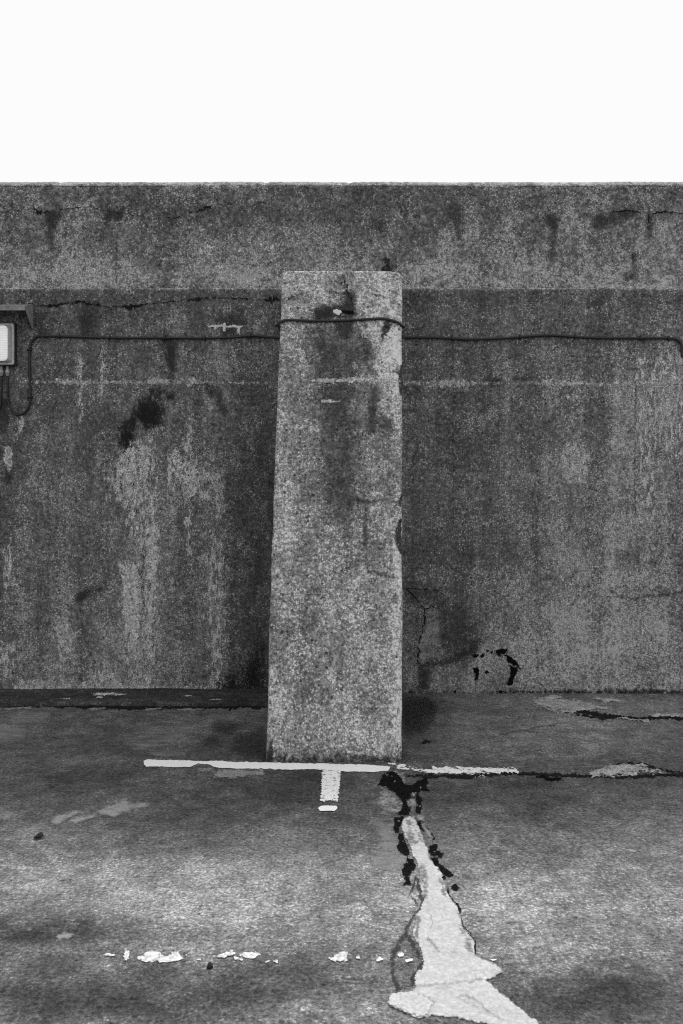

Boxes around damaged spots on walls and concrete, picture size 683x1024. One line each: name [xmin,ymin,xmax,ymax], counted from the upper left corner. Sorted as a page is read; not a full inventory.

crack [608,210,683,228]
crack [27,296,280,310]
damp [0,339,271,689]
crack [406,588,439,662]
crack [574,710,683,721]
crack [404,761,683,779]
crack [390,876,476,992]